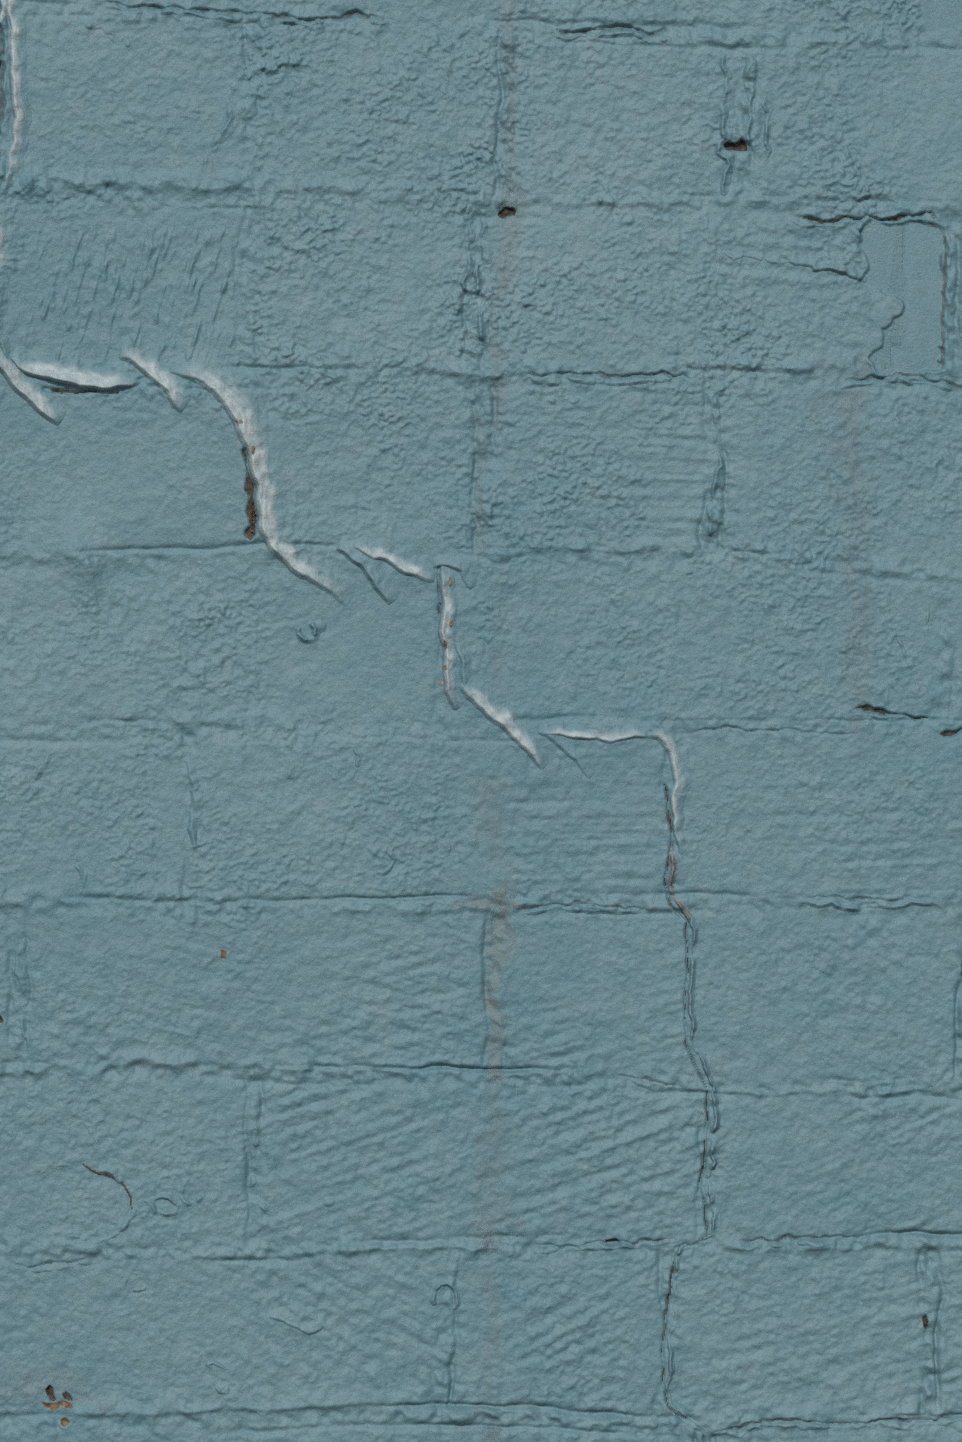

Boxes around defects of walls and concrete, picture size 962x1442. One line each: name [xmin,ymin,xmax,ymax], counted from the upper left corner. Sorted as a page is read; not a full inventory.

crack [554,25,672,45]
crack [792,212,935,229]
crack [0,0,397,606]
crack [529,371,699,387]
crack [336,532,962,1442]
crack [13,1260,91,1273]